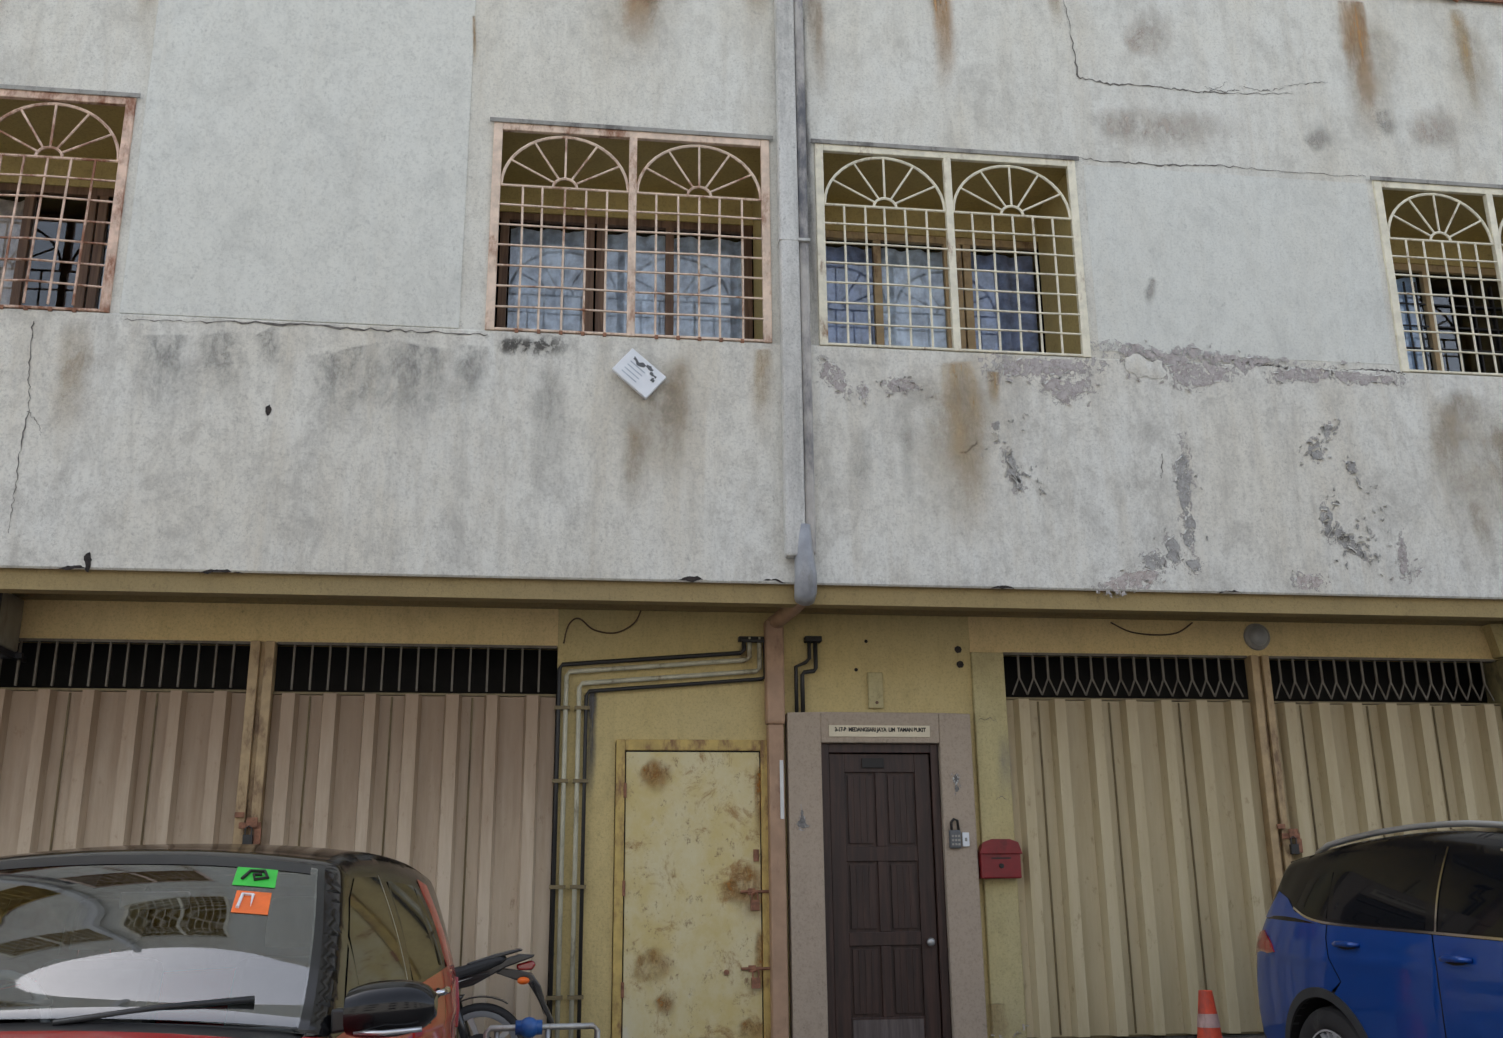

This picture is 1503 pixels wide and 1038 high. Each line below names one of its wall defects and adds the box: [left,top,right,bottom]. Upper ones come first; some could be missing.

crack [1063,0,1324,95]
crack [1081,157,1364,176]
spalling [978,339,1406,407]
crack [8,321,41,533]
peeling [981,413,1048,496]
spalling [1091,432,1208,598]
peeling [1290,418,1423,592]